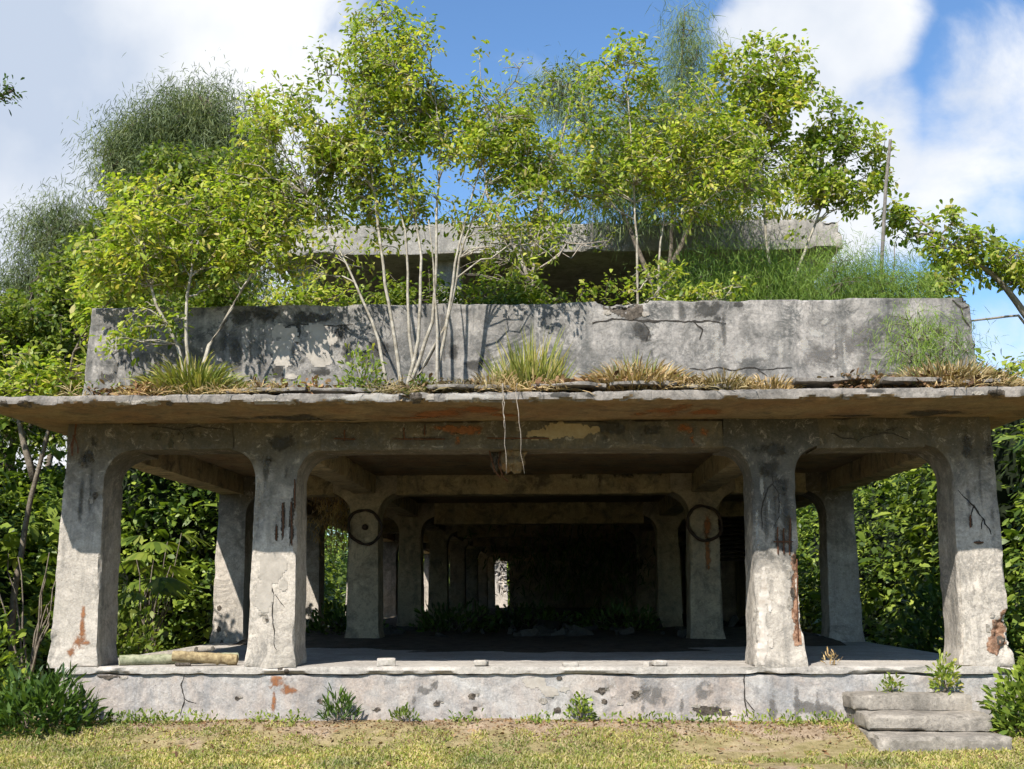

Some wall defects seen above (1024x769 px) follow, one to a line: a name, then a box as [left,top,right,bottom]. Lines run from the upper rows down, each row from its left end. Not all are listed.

crack [592,318,726,341]
rust [394,406,517,444]
peeling [487,421,600,440]
crack [958,490,992,535]
peeling [254,479,296,622]
rust [67,607,89,656]
crack [272,588,284,650]
spalling [986,609,1007,656]
rust [271,676,297,709]